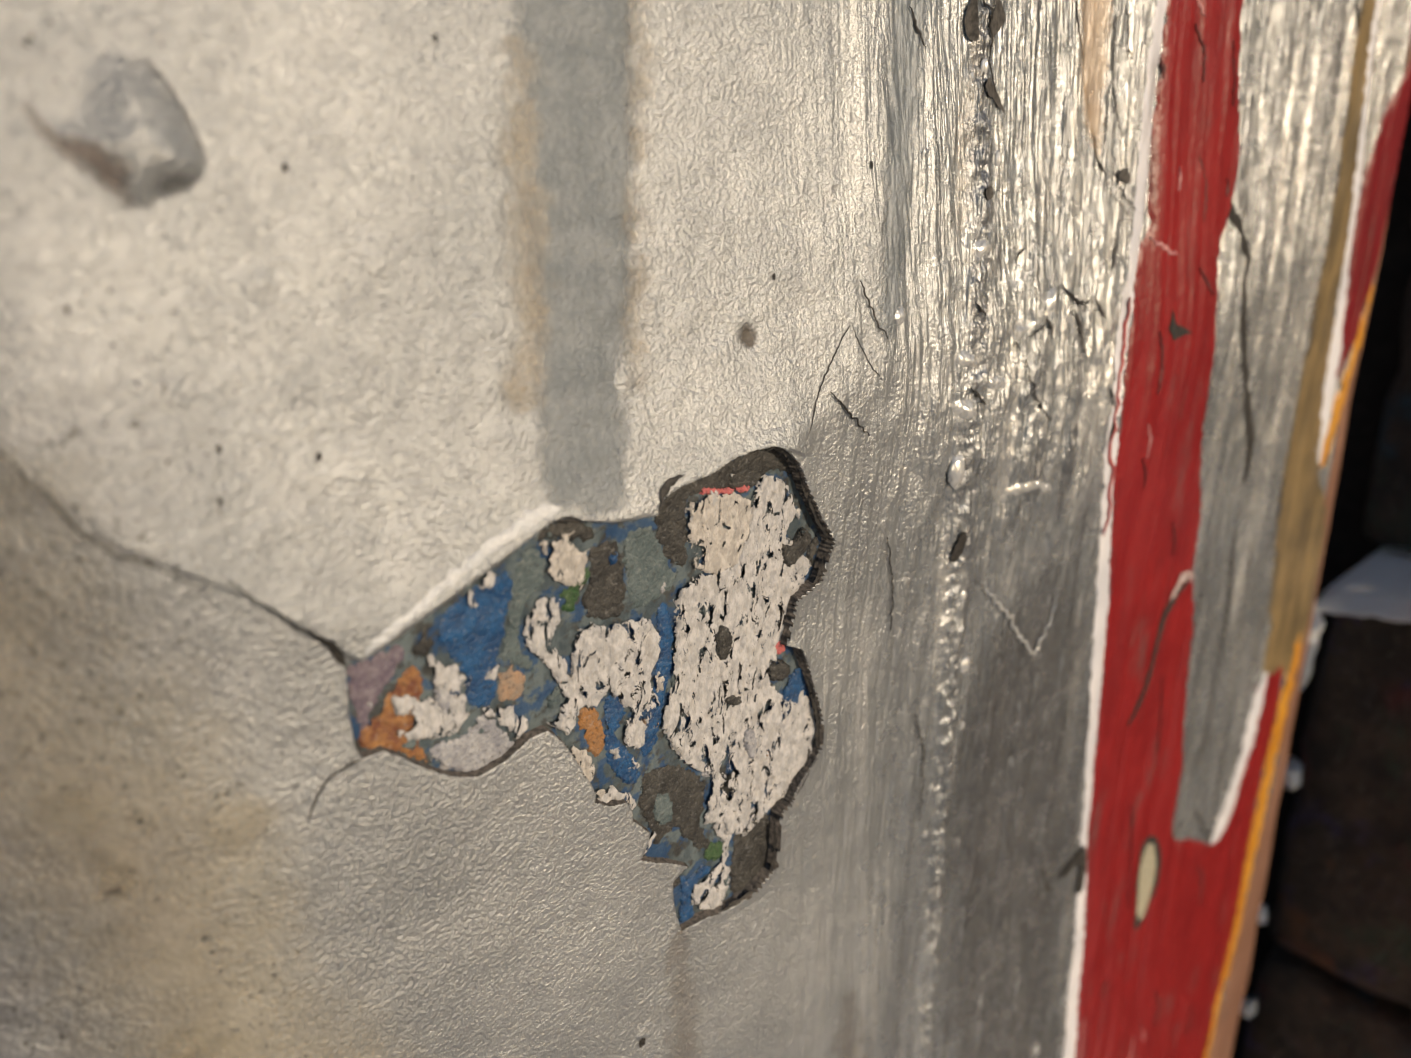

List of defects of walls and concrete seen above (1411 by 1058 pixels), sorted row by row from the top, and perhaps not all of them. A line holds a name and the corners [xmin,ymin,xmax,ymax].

damp [517,0,634,512]
crack [0,451,347,666]
spalling [345,446,831,924]